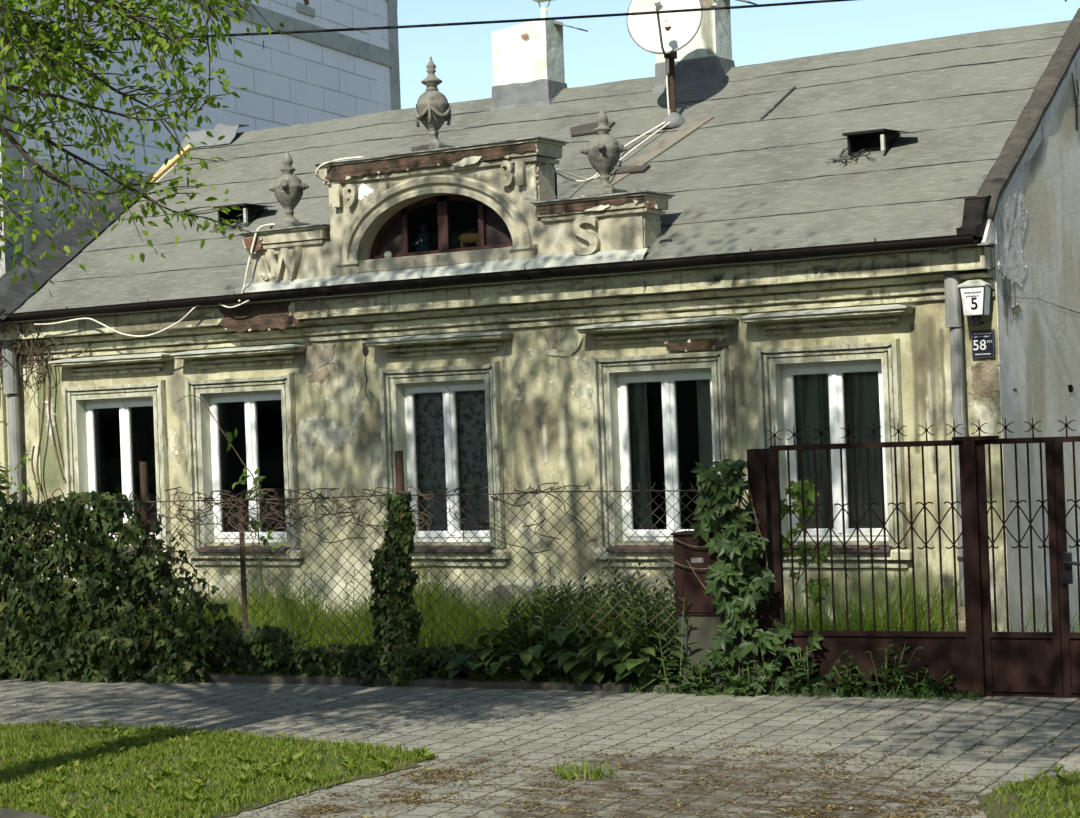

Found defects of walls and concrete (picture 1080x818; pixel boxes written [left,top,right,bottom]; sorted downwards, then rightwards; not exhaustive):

water stain [1003,276,1016,335]
spalling [664,336,739,369]
peeling [296,395,366,456]
water stain [537,407,583,468]